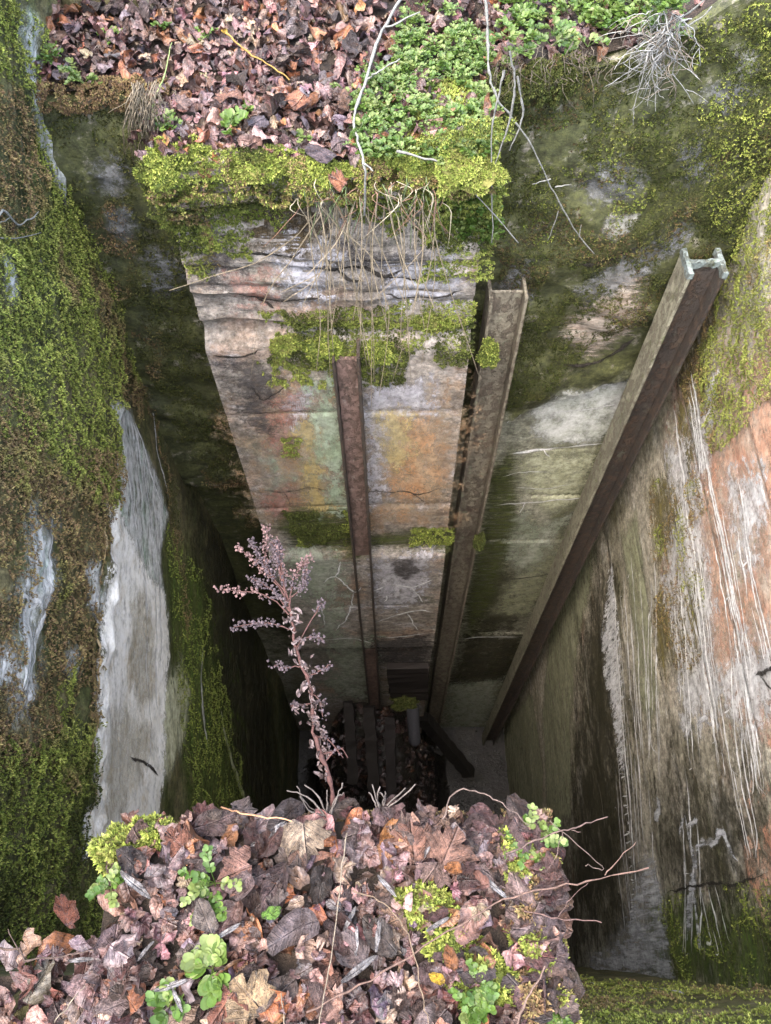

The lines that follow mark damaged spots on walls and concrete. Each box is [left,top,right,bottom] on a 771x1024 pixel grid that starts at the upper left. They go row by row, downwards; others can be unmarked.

damp [367,545,440,613]
crack [369,487,443,502]
corrosion [365,378,459,531]
corrosion [659,307,771,761]
damp [504,364,771,994]
crack [670,873,765,892]